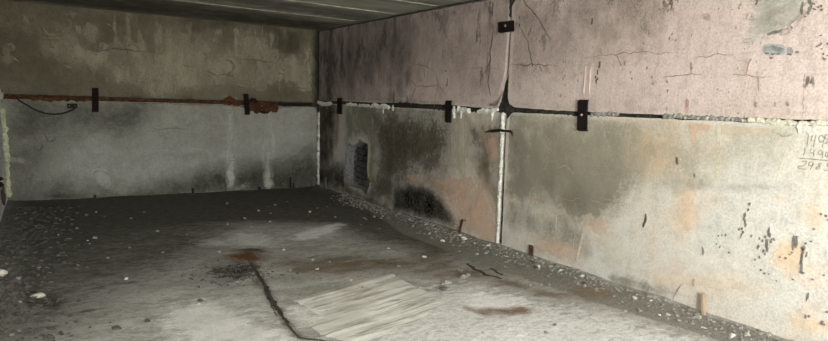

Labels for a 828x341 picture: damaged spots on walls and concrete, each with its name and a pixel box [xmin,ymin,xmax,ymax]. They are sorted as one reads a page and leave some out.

crack [485,24,494,95]
crack [514,0,556,71]
crack [586,48,667,65]
crack [663,53,724,78]
crack [732,59,764,91]
peeling [738,0,823,59]
rust [4,95,313,114]
damp [9,17,697,261]
spalling [344,138,371,194]